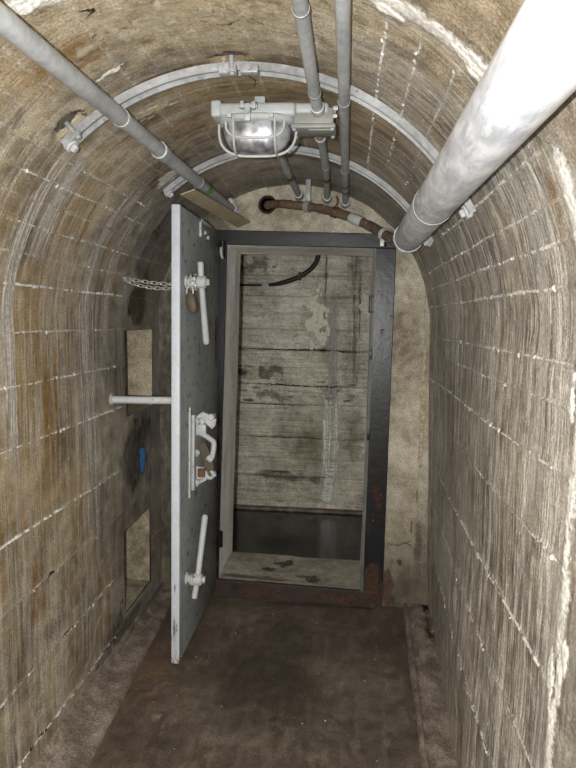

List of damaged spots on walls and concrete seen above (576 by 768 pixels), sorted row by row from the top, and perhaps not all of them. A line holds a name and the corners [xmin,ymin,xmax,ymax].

efflorescence [4,0,67,16]
efflorescence [360,0,488,139]
efflorescence [367,112,403,169]
peeling [304,279,330,351]
efflorescence [320,302,340,503]
efflorescence [429,145,576,768]